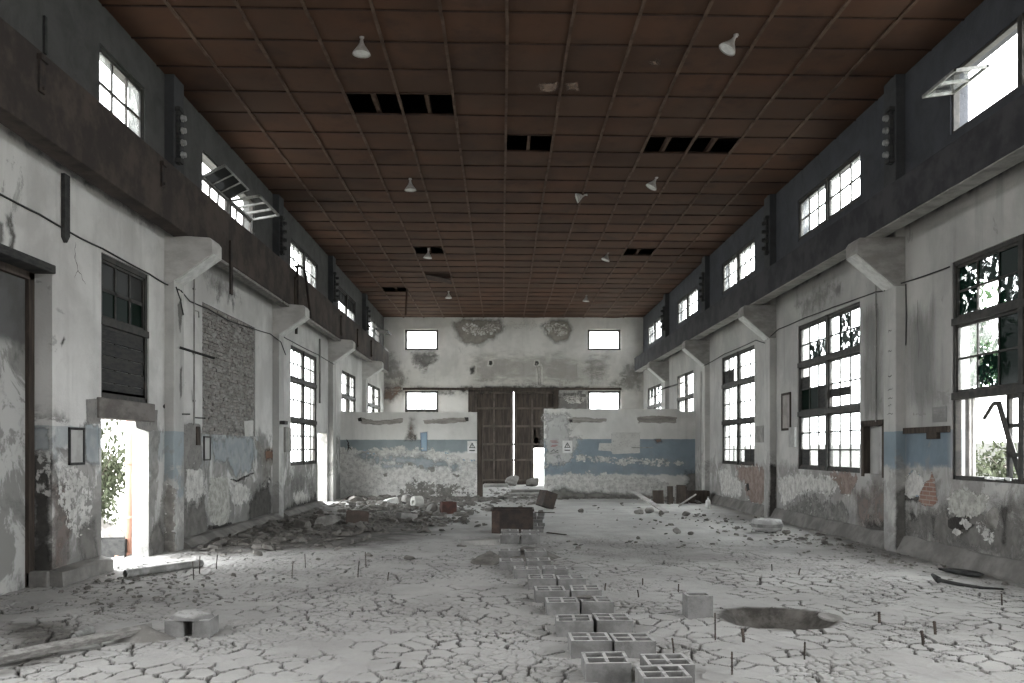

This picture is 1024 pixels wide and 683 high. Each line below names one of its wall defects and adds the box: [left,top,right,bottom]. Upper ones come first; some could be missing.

peeling [36,450,94,539]
flaking render [231,482,251,507]
peeling [340,445,477,498]
peeling [546,453,684,496]
flaking render [718,463,764,505]
flaking render [777,470,857,523]
flaking render [905,470,1000,545]